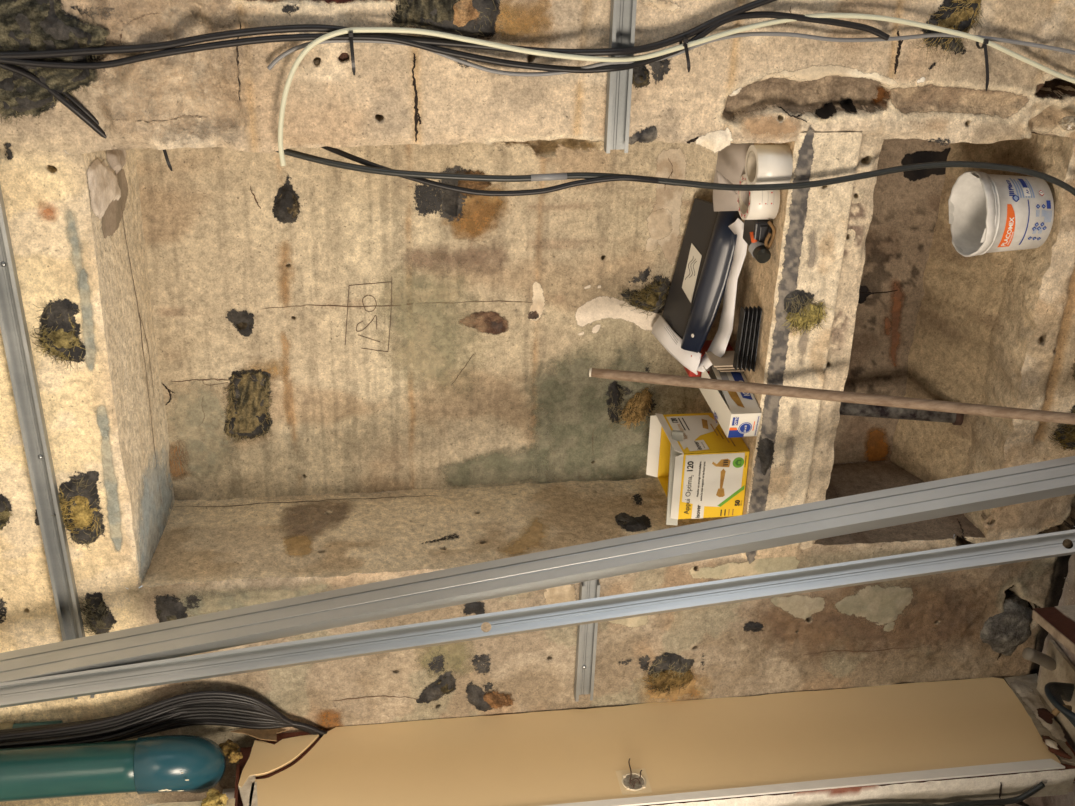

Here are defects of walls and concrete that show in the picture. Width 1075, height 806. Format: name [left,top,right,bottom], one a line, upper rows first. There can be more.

crack [412,54,421,142]
spalling [695,65,1075,153]
peeling [645,147,687,265]
spalling [901,148,951,181]
peeling [771,585,914,632]